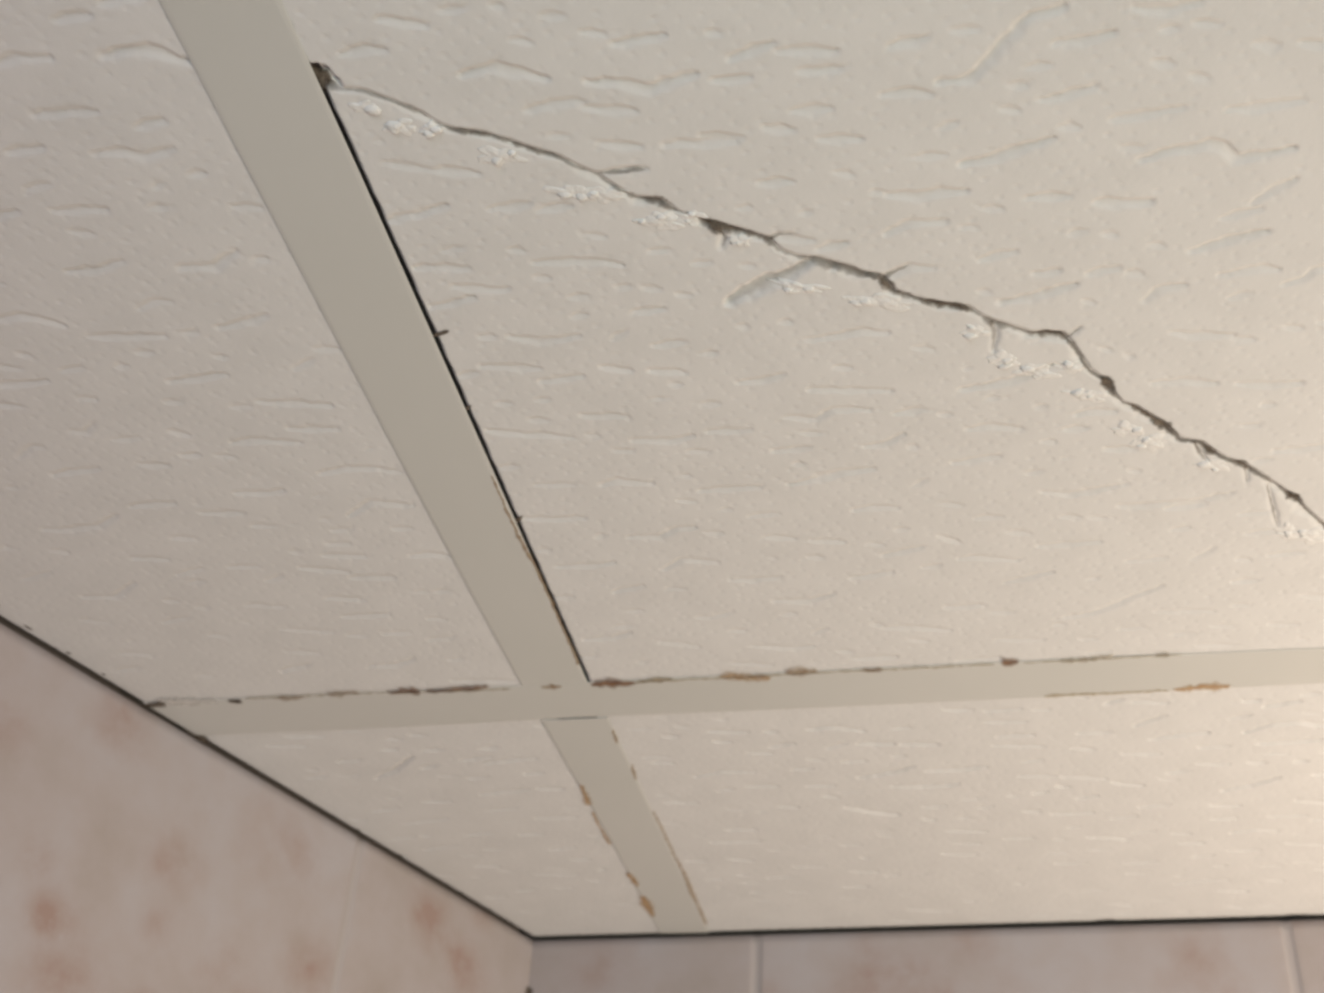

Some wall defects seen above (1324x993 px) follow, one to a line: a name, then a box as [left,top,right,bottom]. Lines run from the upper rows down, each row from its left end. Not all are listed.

crack [310,64,332,88]
crack [448,127,558,156]
crack [632,195,773,243]
crack [830,262,993,322]
crack [1028,330,1324,525]
rust [387,685,497,695]
rust [592,678,687,687]
rust [716,670,847,680]
rust [1046,684,1229,697]